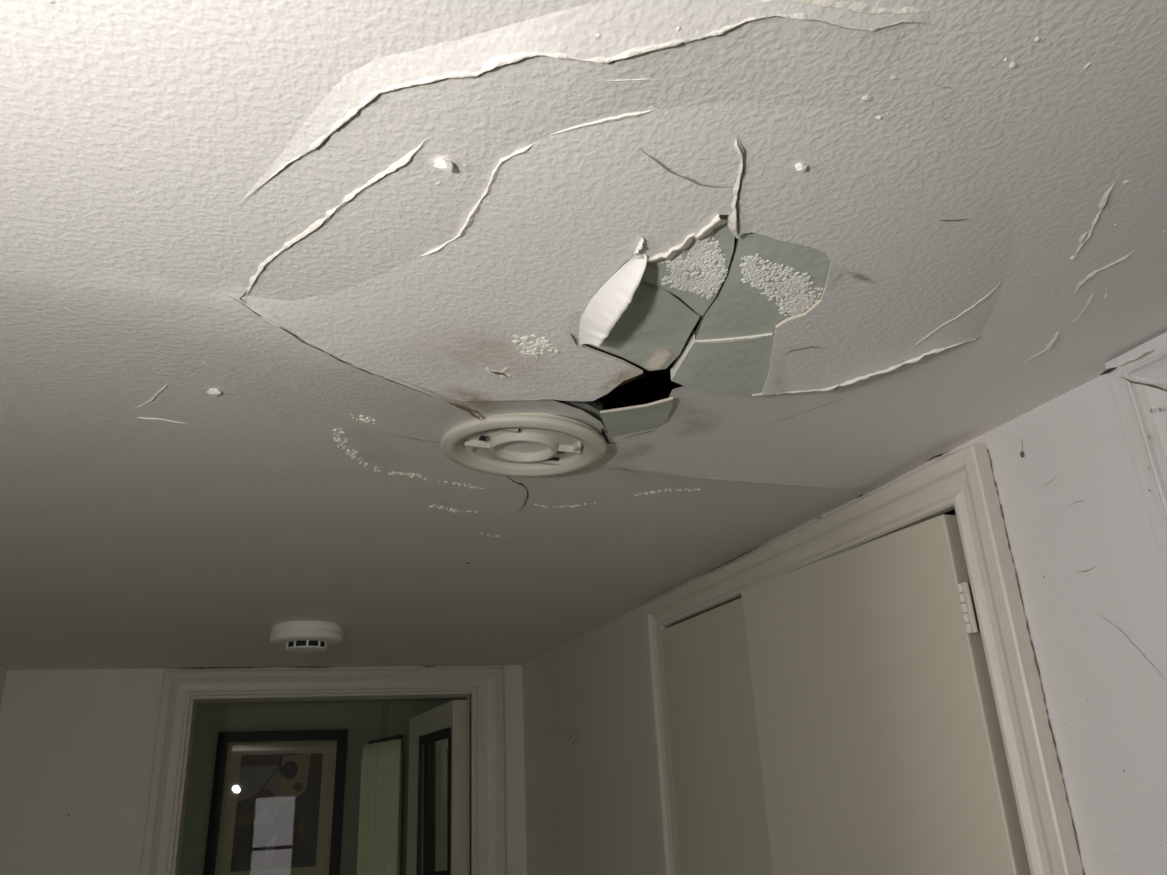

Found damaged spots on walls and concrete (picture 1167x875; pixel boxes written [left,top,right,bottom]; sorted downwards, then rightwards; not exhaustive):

peeling [239,0,940,206]
spalling [512,335,560,358]
spalling [570,214,830,397]
peeling [779,278,1003,394]
spalling [551,397,673,444]
crack [507,476,529,513]